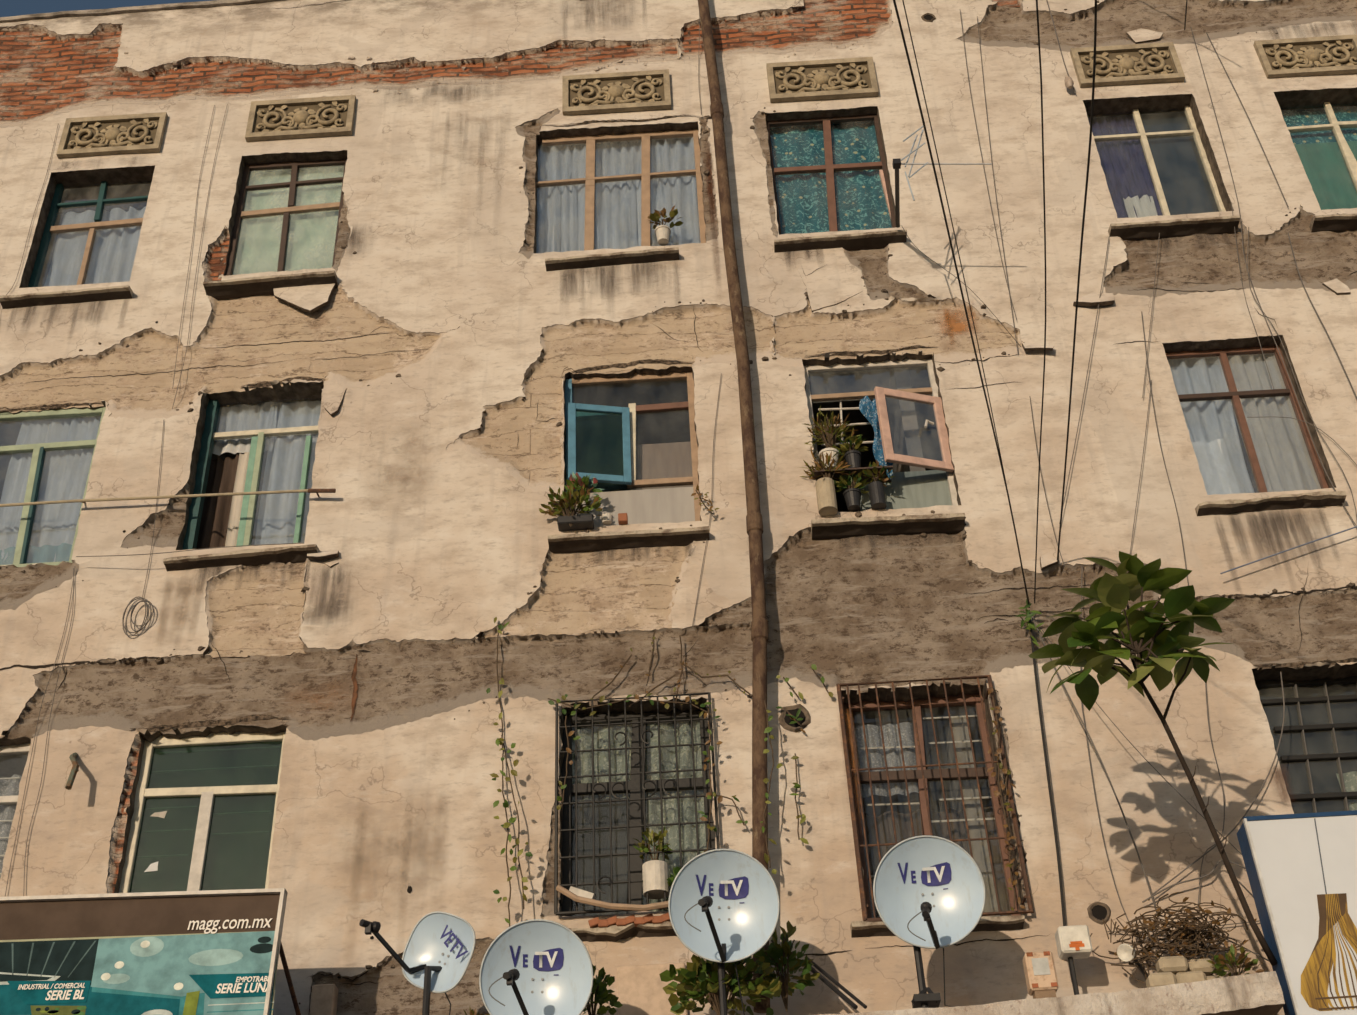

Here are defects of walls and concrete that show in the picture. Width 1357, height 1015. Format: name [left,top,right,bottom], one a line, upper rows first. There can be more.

flaking render [0,0,893,128]
flaking render [958,0,1357,52]
flaking render [0,195,451,419]
flaking render [446,244,1054,495]
flaking render [121,483,193,550]
crack [0,656,176,690]
flaking render [0,523,1129,917]
flaking render [299,937,494,1015]